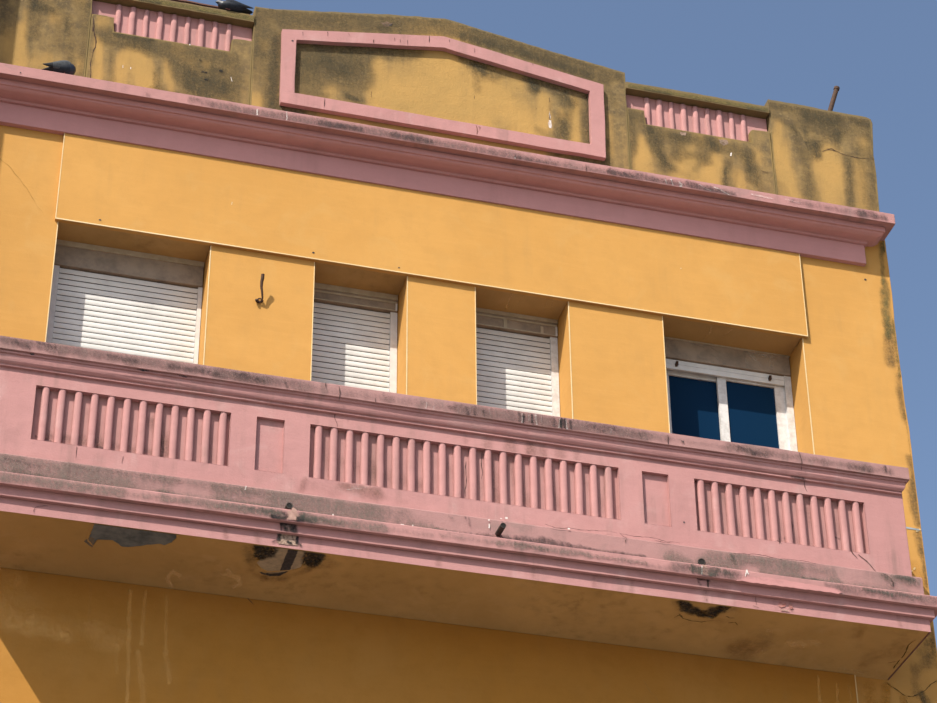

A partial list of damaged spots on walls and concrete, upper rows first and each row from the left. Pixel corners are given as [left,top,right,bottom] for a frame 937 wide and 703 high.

water stain [104,33,235,99]
water stain [141,0,869,134]
water stain [601,113,734,195]
water stain [882,278,890,337]
water stain [0,453,136,488]
spalling [84,524,180,549]
water stain [214,483,388,567]
water stain [470,533,646,557]
water stain [666,553,844,587]
water stain [677,599,730,618]
crack [887,640,936,702]